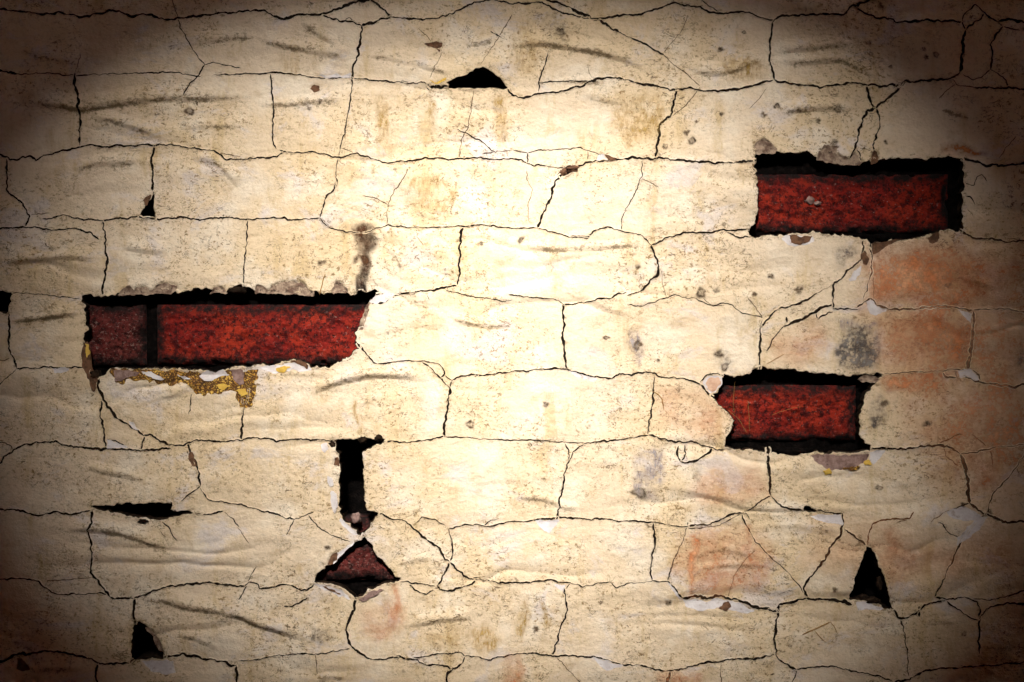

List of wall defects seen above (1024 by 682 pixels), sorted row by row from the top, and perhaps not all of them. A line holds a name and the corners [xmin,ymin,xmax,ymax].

spalling [426,64,510,92]
crack [0,0,1024,168]
crack [0,292,350,543]
spalling [79,281,394,408]
leakage [354,224,375,292]
crack [0,55,751,444]
spalling [703,351,885,475]
crack [629,239,1024,390]
spalling [746,138,967,281]
mould [835,323,879,369]
spalling [312,434,403,602]
crack [239,378,1024,682]